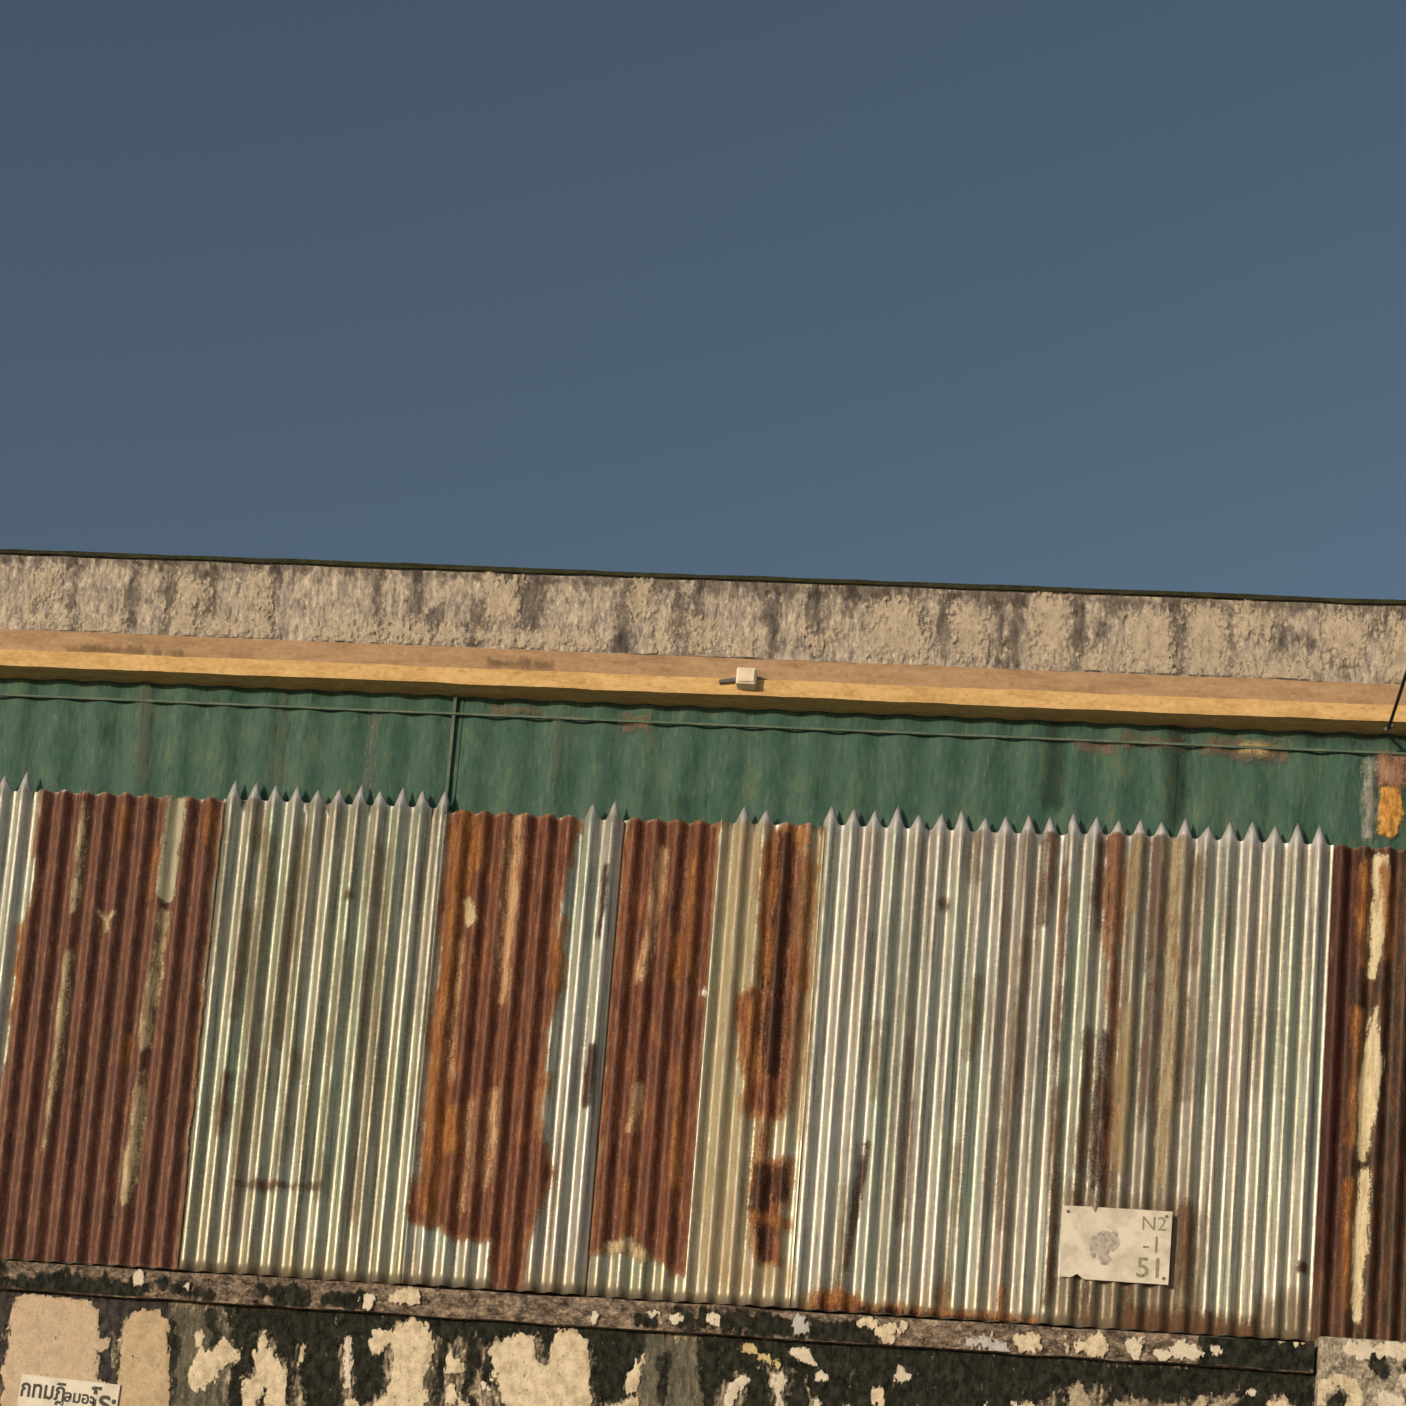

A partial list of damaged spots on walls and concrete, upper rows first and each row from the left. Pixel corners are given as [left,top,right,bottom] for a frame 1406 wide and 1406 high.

corrosion [0,789,224,1269]
corrosion [404,810,584,1290]
corrosion [581,817,721,1278]
corrosion [731,823,821,1269]
corrosion [1296,751,1406,1341]
peeling [0,1293,306,1406]
peeling [343,1286,470,1406]
peeling [480,1311,646,1406]
peeling [741,1312,829,1406]
spalling [964,1331,1043,1354]
spalling [1064,1330,1223,1361]
spalling [1317,1339,1406,1406]